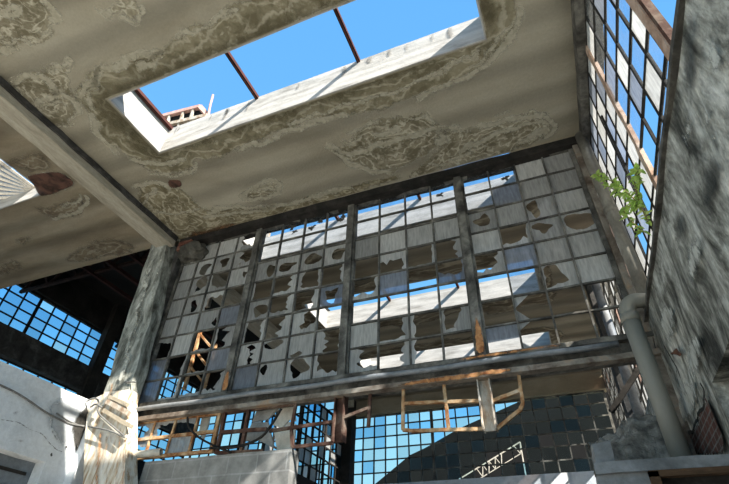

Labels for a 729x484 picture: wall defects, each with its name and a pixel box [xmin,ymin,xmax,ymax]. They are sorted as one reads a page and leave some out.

water stain [0,0,63,55]
water stain [10,0,558,240]
water stain [261,240,346,272]
corrosion [463,318,557,360]
corrosion [402,369,511,385]
flaking render [679,337,724,455]